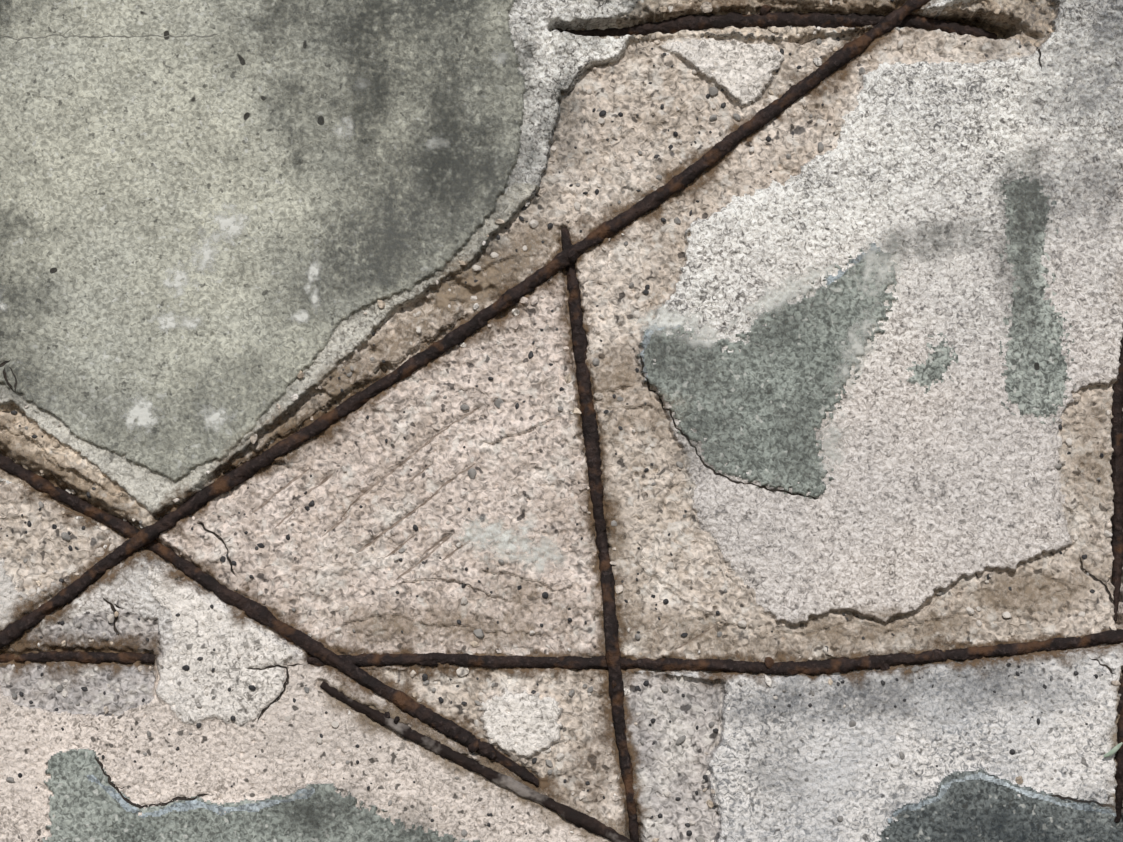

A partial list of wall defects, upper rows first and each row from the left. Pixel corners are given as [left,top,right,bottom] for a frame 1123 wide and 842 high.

corrosion [764,0,929,105]
water stain [316,0,535,286]
water stain [164,204,248,296]
water stain [293,264,319,322]
spalling [0,0,907,630]
water stain [638,308,716,366]
peeling [576,0,1123,662]
water stain [126,398,157,431]
water stain [202,410,226,430]
corrosion [0,115,764,842]
spalling [0,270,1123,842]
corrosion [614,575,1123,684]